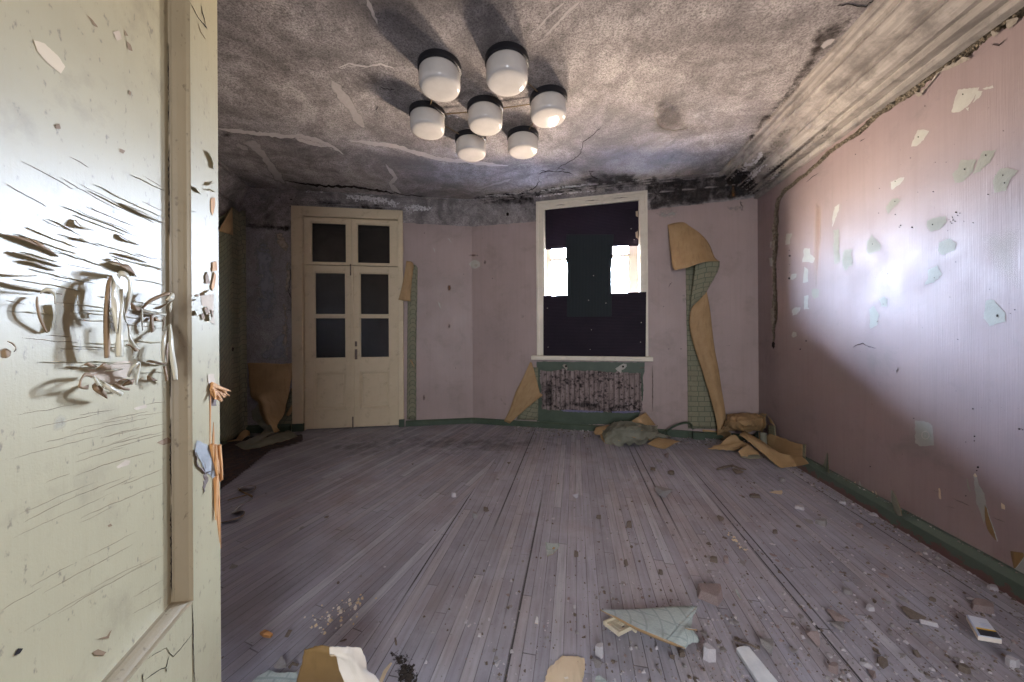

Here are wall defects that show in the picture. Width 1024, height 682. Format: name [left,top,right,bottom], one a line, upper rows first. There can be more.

crack [218,63,601,197]
peeling [952,85,993,113]
mould [475,165,757,209]
crack [770,7,1024,349]
peeling [0,341,17,358]
peeling [0,233,62,333]
peeling [78,234,178,399]
peeling [195,261,218,324]
peeling [785,233,815,315]
peeling [925,212,960,285]
mould [536,361,645,425]
peeling [195,440,215,478]